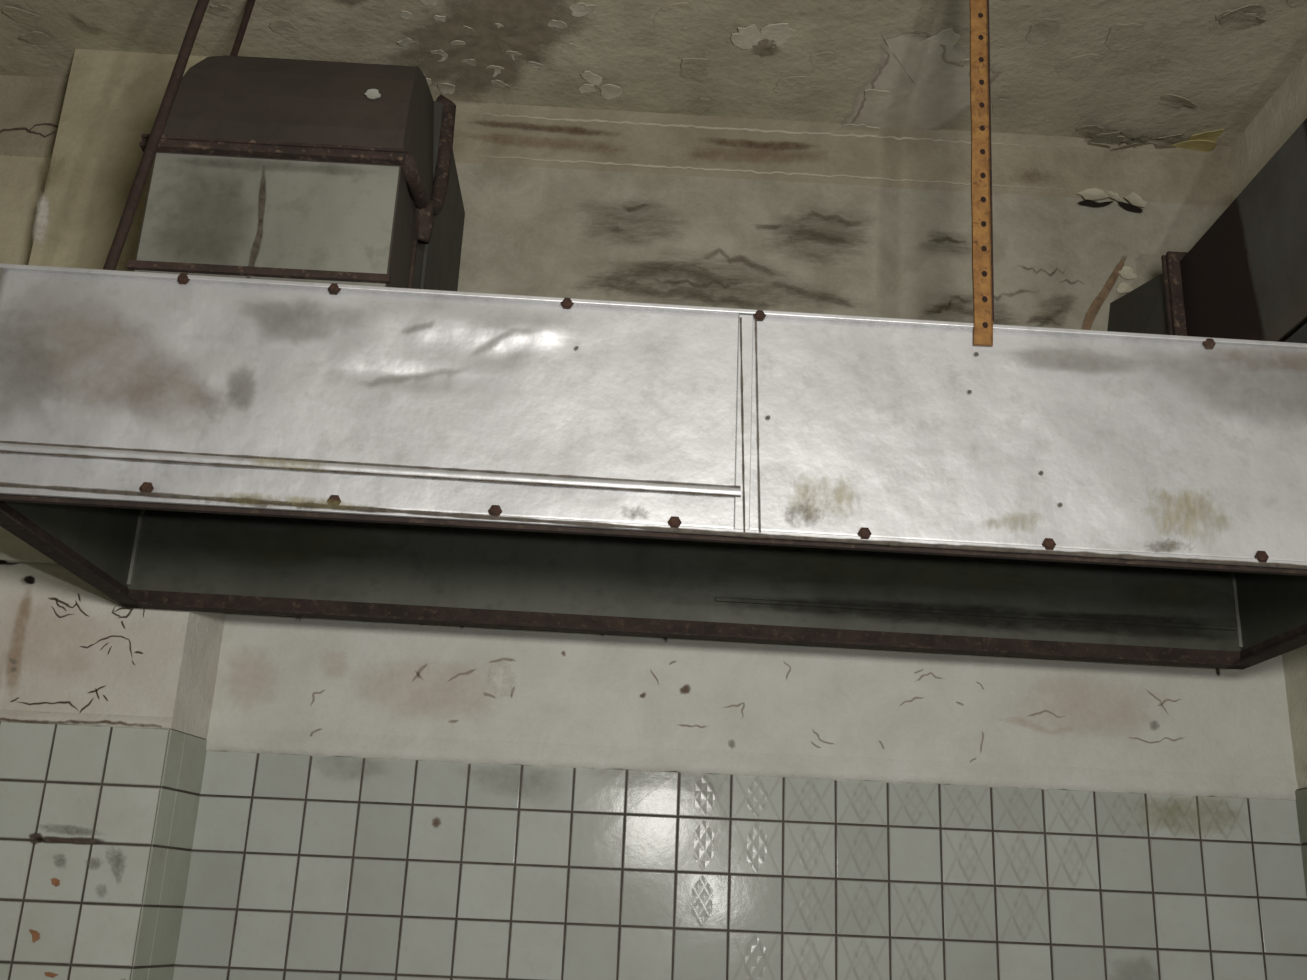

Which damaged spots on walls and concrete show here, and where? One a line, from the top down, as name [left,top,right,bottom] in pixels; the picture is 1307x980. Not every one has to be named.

crack [49,594,145,665]
crack [0,686,154,726]